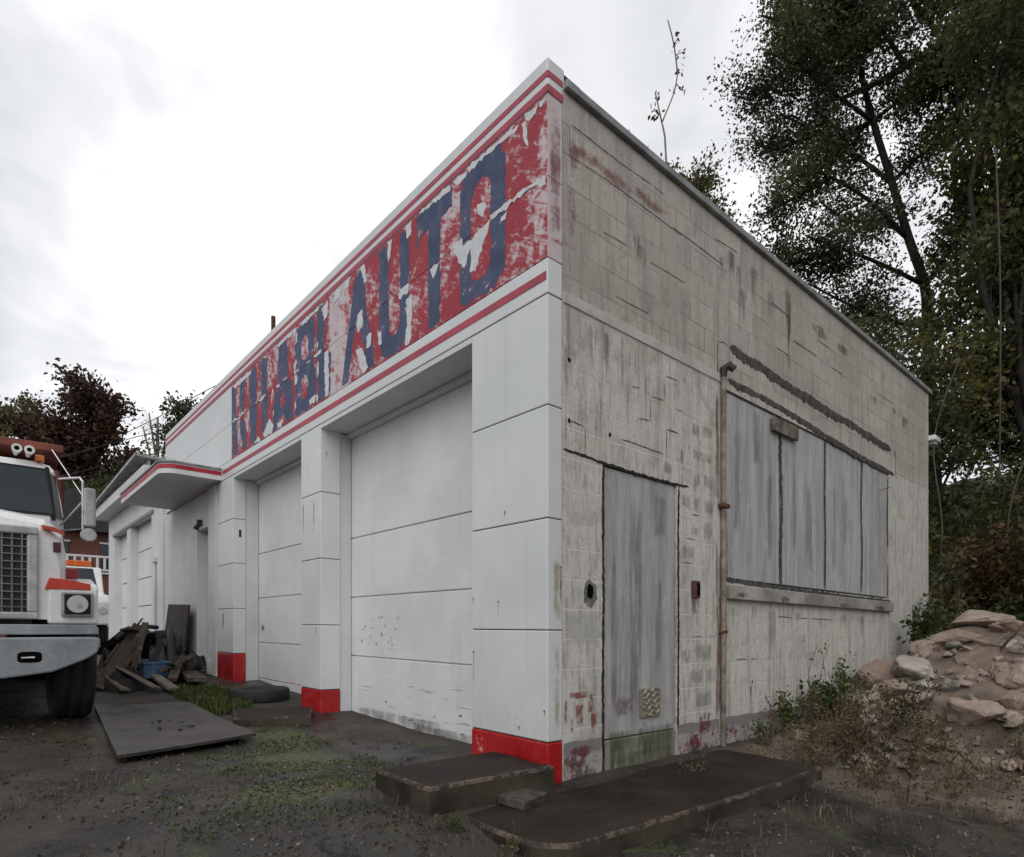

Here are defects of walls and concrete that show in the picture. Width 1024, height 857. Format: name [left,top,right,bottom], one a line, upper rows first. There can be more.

peeling [405,97,545,239]
peeling [453,176,546,272]
peeling [277,265,367,347]
peeling [356,309,382,373]
peeling [399,283,412,345]
peeling [233,341,329,444]
rust [716,598,727,716]